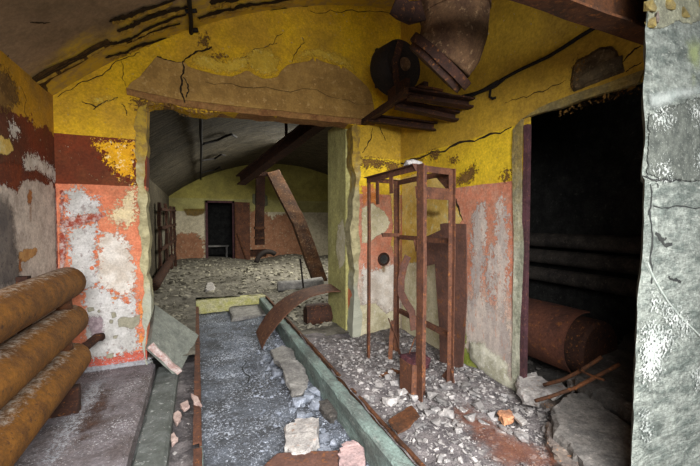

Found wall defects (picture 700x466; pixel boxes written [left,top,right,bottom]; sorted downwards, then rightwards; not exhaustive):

crack [58,52,139,115]
crack [157,46,212,103]
flaking render [126,31,375,128]
flaking render [569,46,625,92]
crack [400,127,512,164]
peeling [0,64,182,375]
peeling [359,155,417,336]
peeling [426,168,513,380]